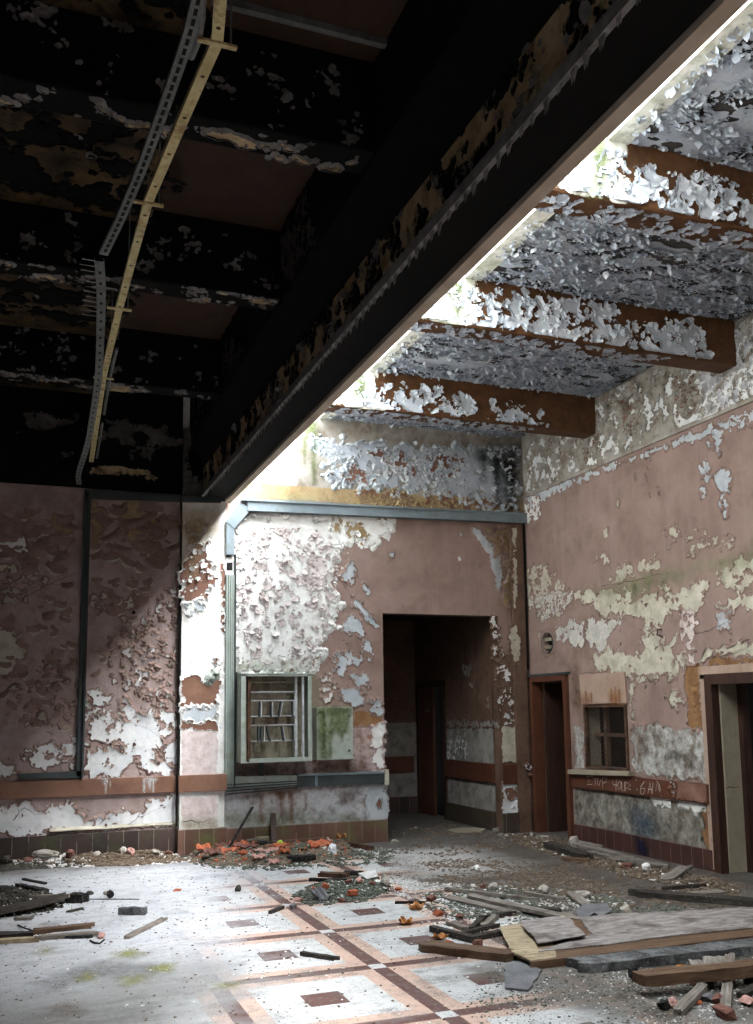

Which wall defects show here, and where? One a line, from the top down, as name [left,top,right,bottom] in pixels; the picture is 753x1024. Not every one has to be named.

peeling [6,0,69,49]
peeling [0,85,56,107]
peeling [89,54,363,173]
peeling [223,234,396,463]
mould [480,451,517,507]
peeling [306,10,753,849]
peeling [0,512,397,820]
peeling [0,792,219,837]